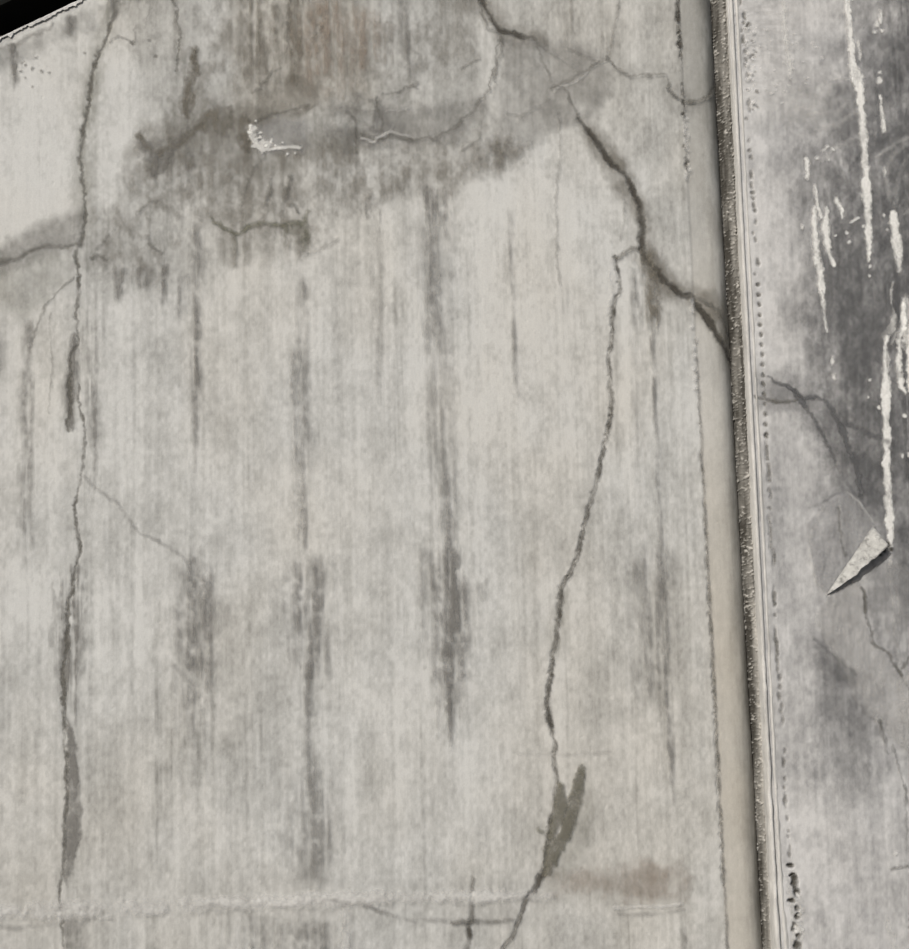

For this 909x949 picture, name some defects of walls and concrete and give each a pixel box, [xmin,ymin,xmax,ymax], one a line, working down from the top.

crack [78,19,113,183]
spalling [247,120,300,155]
leakage [801,0,903,331]
crack [66,313,97,439]
crack [546,121,730,829]
leakage [868,297,909,548]
crack [58,495,82,910]
leakage [296,564,322,713]
leakage [431,542,467,724]
peeling [826,527,893,595]
leakage [538,764,585,875]
crack [466,870,545,949]